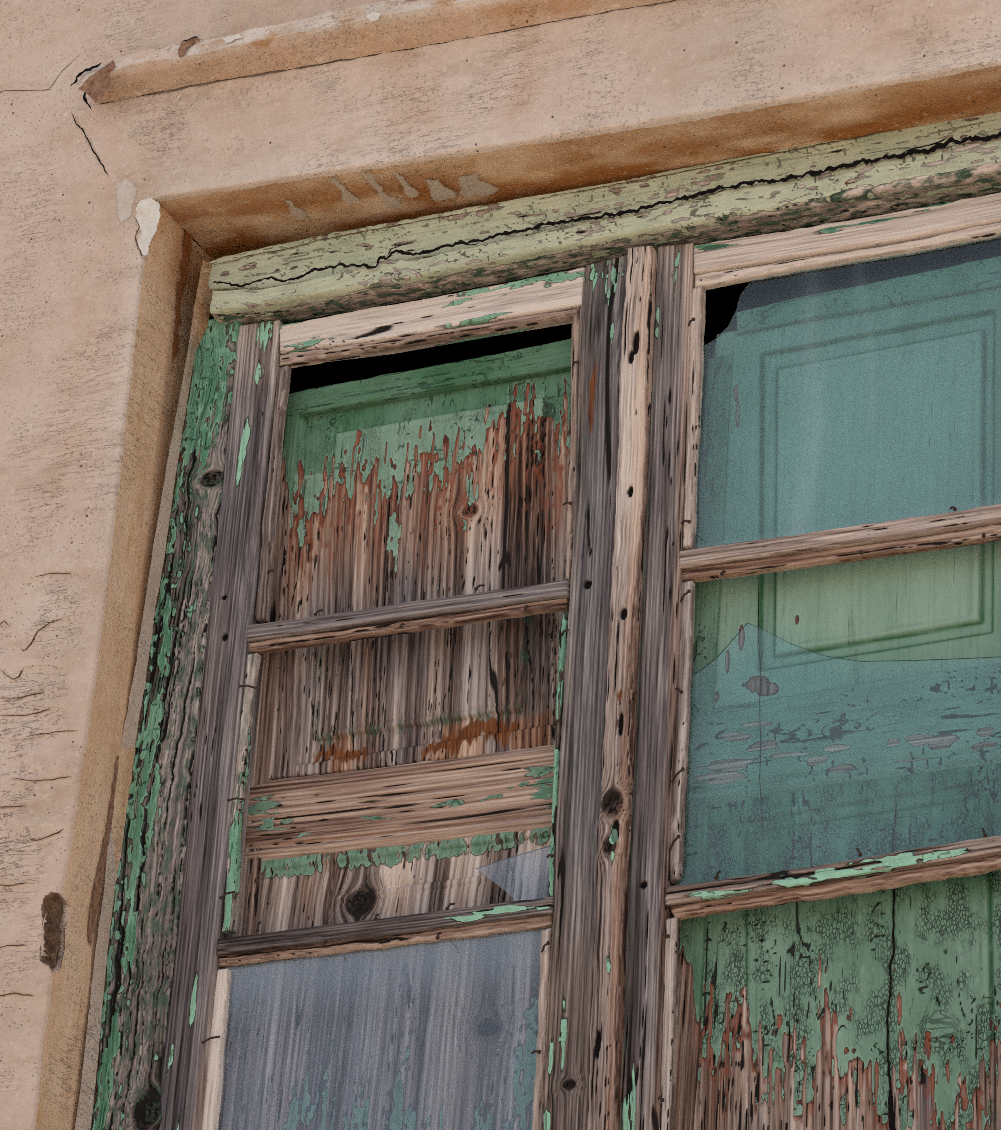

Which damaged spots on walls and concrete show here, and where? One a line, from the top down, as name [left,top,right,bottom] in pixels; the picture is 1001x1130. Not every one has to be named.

spalling [71,60,115,110]
crack [71,112,108,175]
flaking render [115,179,161,257]
crack [211,125,1001,287]
spalling [39,892,63,971]